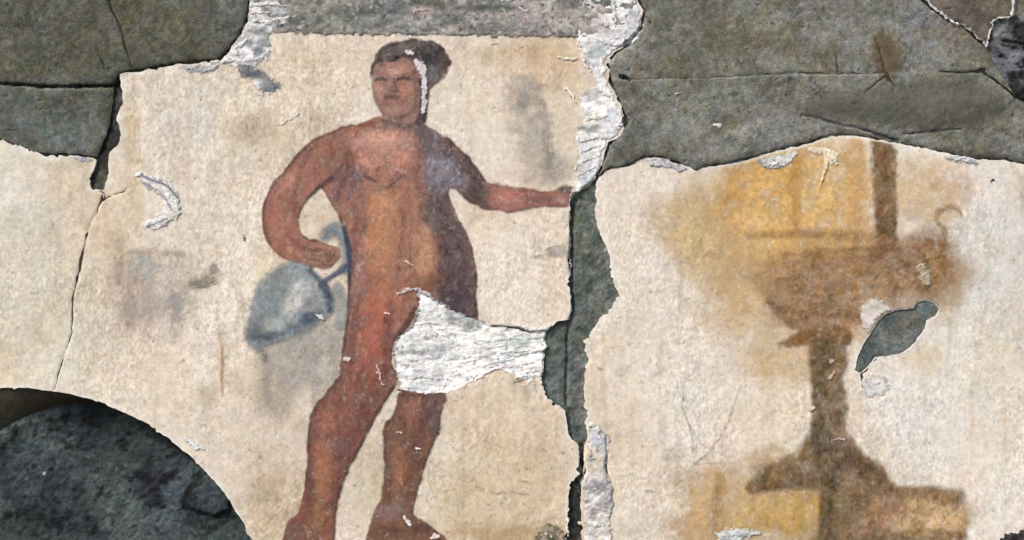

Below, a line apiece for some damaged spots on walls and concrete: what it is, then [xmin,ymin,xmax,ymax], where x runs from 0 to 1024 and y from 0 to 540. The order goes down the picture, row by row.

peeling [926,0,1015,47]
crack [622,40,896,92]
spalling [75,80,123,190]
peeling [647,157,687,172]
crack [803,115,962,141]
peeling [945,155,978,165]
peeling [135,172,181,230]
crack [54,190,125,389]
spalling [178,0,644,540]
spalling [855,263,942,397]